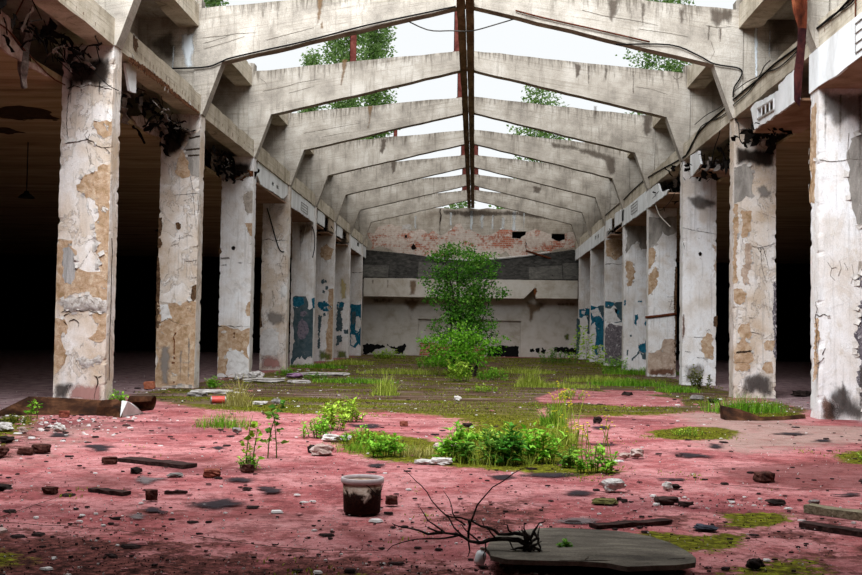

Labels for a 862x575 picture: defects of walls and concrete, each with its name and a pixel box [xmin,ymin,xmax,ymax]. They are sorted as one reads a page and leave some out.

water stain [609,0,618,19]
water stain [708,10,731,39]
corrosion [791,0,807,106]
crack [64,82,112,153]
water stain [643,115,652,134]
spalling [844,130,862,231]
flaking render [56,163,111,344]
flaking render [368,224,576,258]
flaking render [155,217,196,388]
flaking render [217,293,280,376]
peeling [279,279,407,365]
flaking render [530,267,677,377]